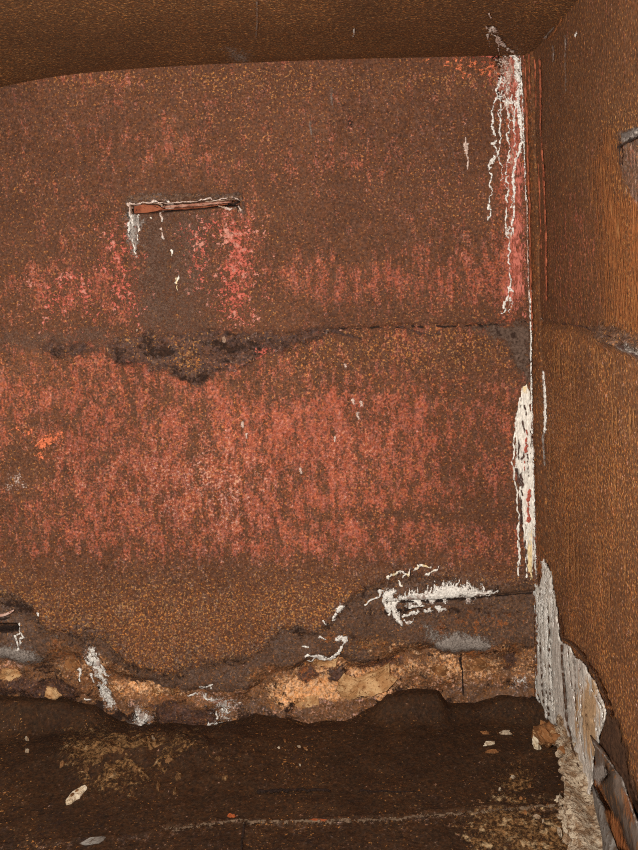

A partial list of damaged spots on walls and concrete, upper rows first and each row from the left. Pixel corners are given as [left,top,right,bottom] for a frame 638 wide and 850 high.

leakage [127,211,204,329]
crack [324,323,498,340]
leakage [473,13,547,580]
leakage [364,564,498,626]
leakage [77,647,115,708]
spalling [0,559,638,850]